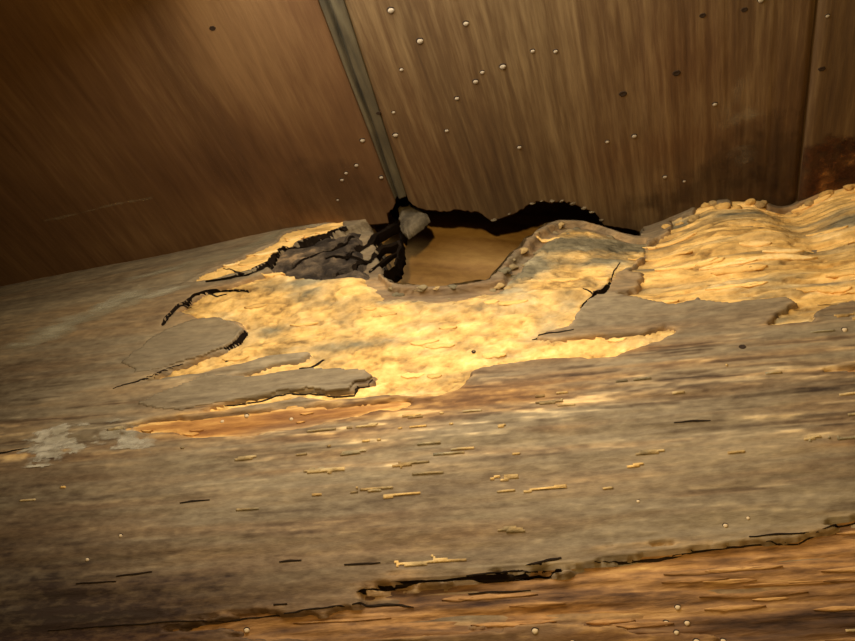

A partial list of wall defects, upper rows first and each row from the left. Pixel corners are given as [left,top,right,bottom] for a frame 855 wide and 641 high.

crack [161,201,408,326]
spalling [107,184,855,449]
spalling [392,441,474,475]
spalling [627,449,665,468]
crack [595,522,855,565]
crack [48,557,562,631]